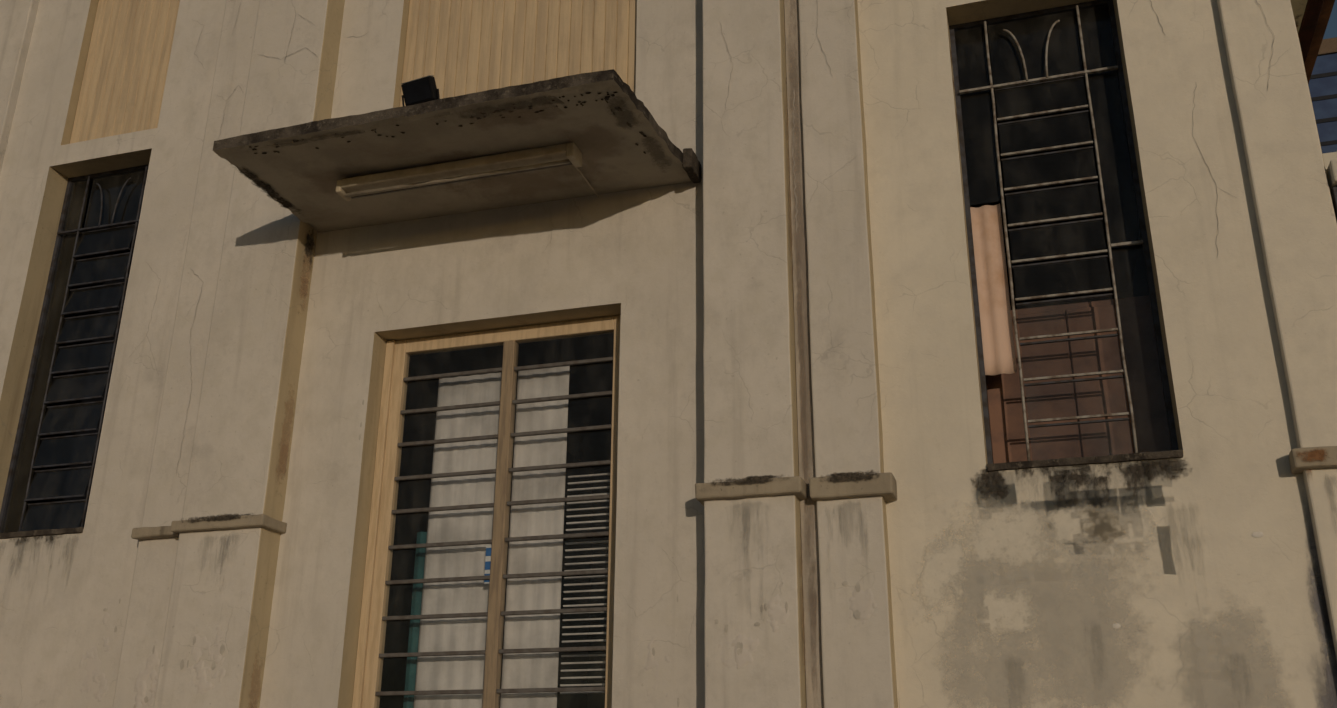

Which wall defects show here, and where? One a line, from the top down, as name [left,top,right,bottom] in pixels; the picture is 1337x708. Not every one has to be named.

water stain [971,458,1192,507]
water stain [954,555,1128,708]